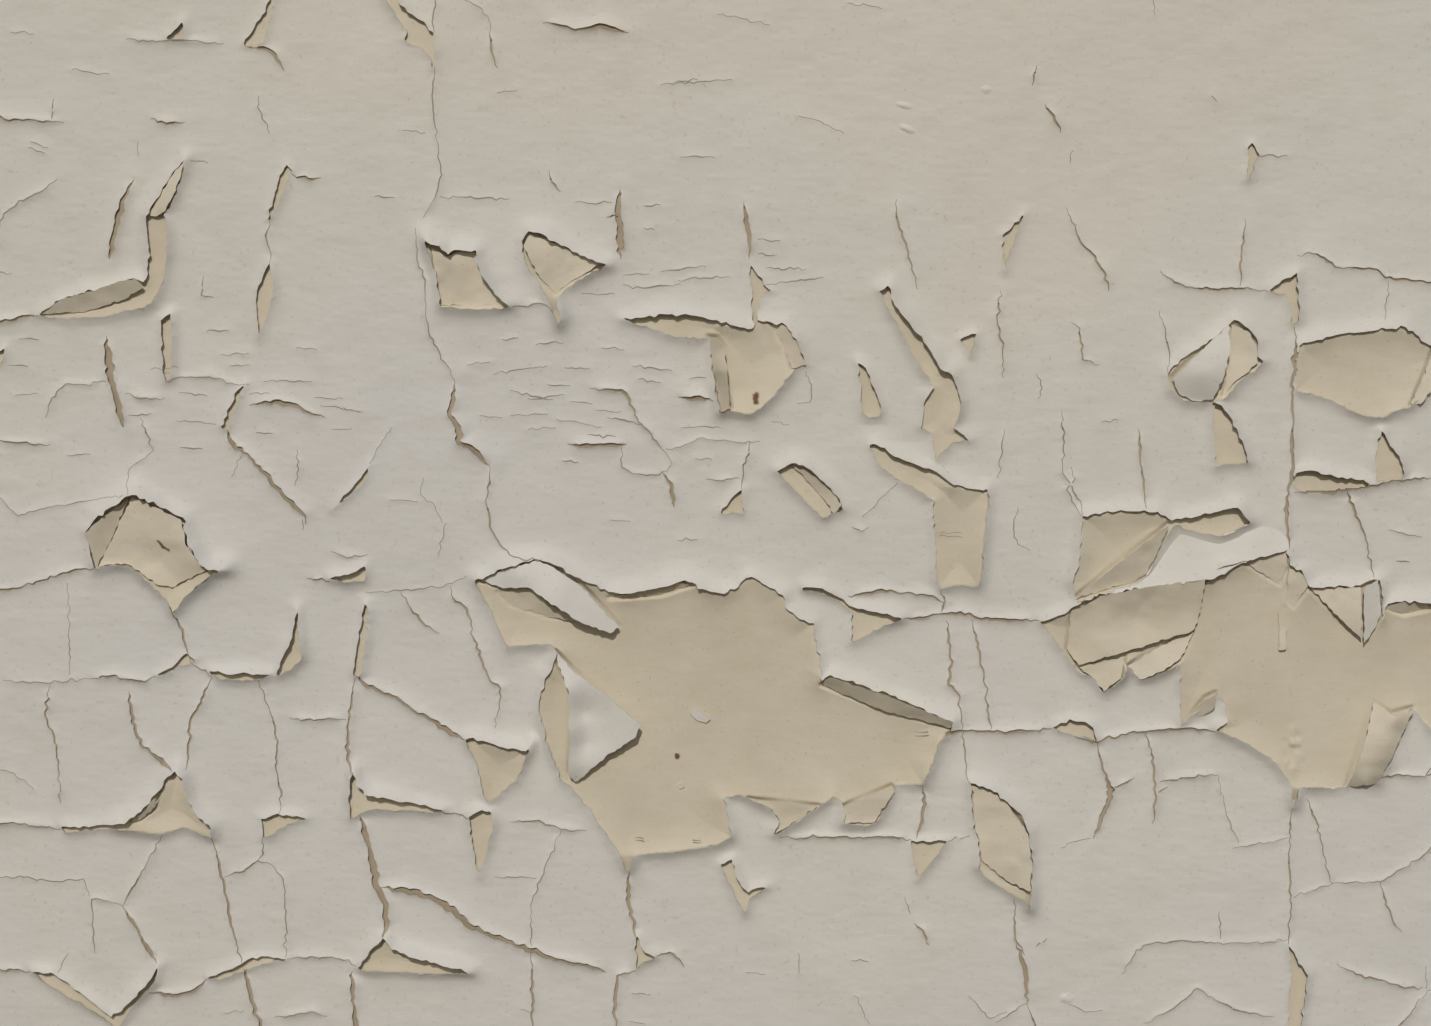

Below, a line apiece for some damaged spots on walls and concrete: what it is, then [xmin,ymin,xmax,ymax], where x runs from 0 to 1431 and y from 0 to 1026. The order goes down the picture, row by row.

crack [0,568,212,830]
peeling [85,495,218,613]
crack [0,276,392,531]
crack [211,482,502,1026]
crack [359,815,684,1026]
crack [402,0,823,561]
peeling [475,559,953,870]
peeling [624,266,806,415]
peeling [870,286,989,589]
crack [848,589,1431,974]
peeling [1041,508,1431,805]
peeling [1294,326,1431,492]